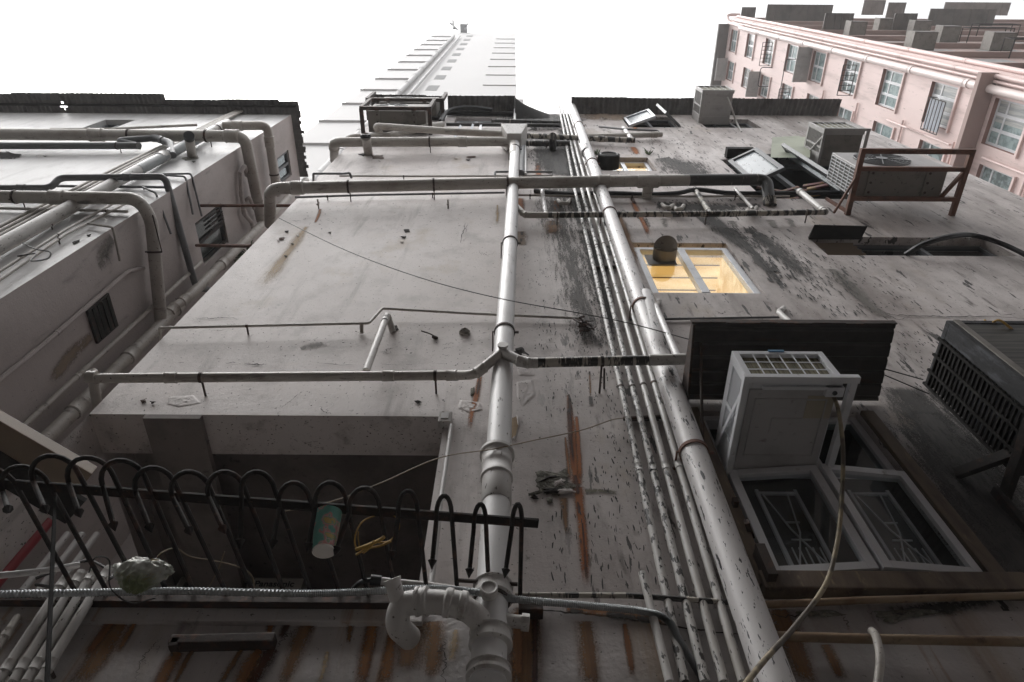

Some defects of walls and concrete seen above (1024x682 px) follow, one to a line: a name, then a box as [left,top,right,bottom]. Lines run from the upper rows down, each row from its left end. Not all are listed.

damp [527,133,575,175]
damp [725,218,813,279]
damp [578,230,614,334]
rust [559,395,589,576]
rust [70,624,136,681]
rust [154,651,194,682]
rust [219,625,314,682]
rust [347,621,458,682]
rust [509,608,541,682]
rust [579,621,599,682]
rust [622,624,634,672]